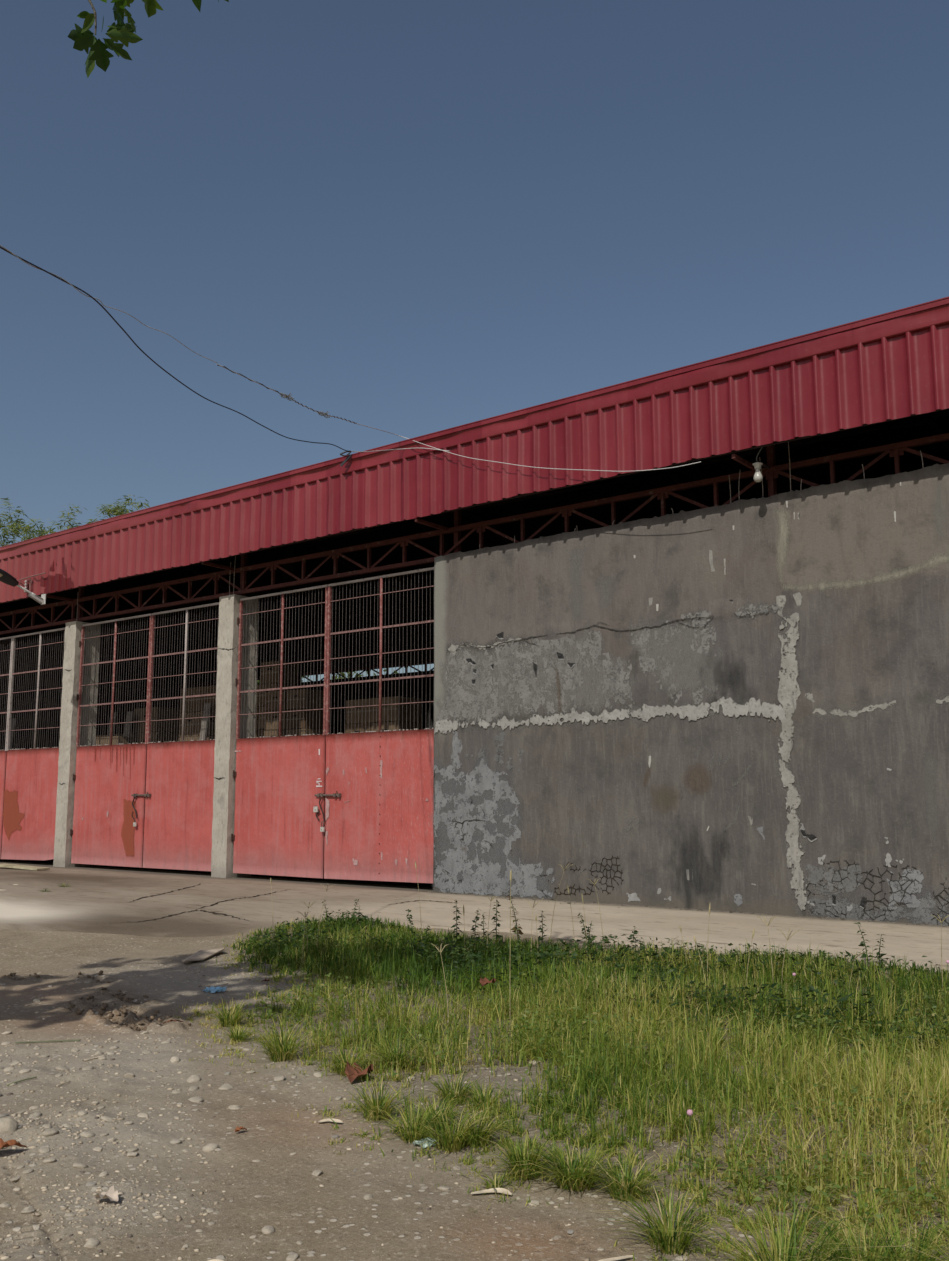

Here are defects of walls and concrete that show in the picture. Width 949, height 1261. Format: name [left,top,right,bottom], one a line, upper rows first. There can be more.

peeling [433,592,949,926]
corrosion [3,790,24,839]
corrosion [121,800,135,856]